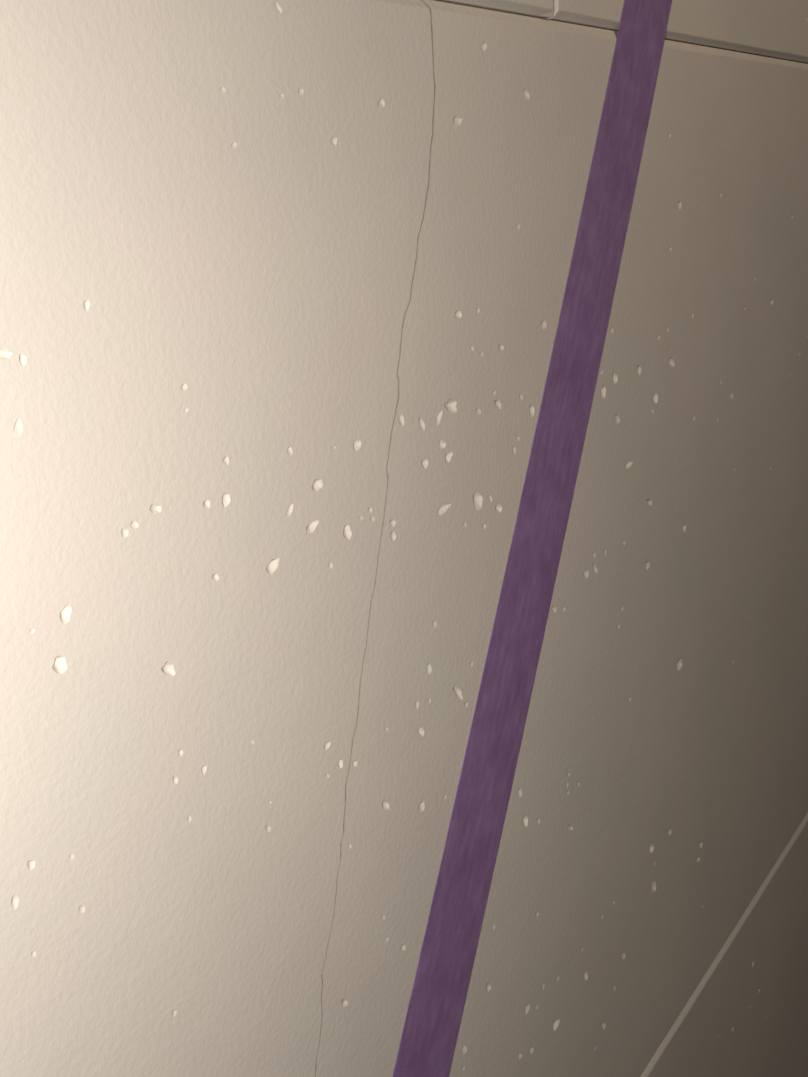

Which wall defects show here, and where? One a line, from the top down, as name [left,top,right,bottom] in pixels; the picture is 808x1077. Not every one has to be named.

crack [315,0,436,1077]